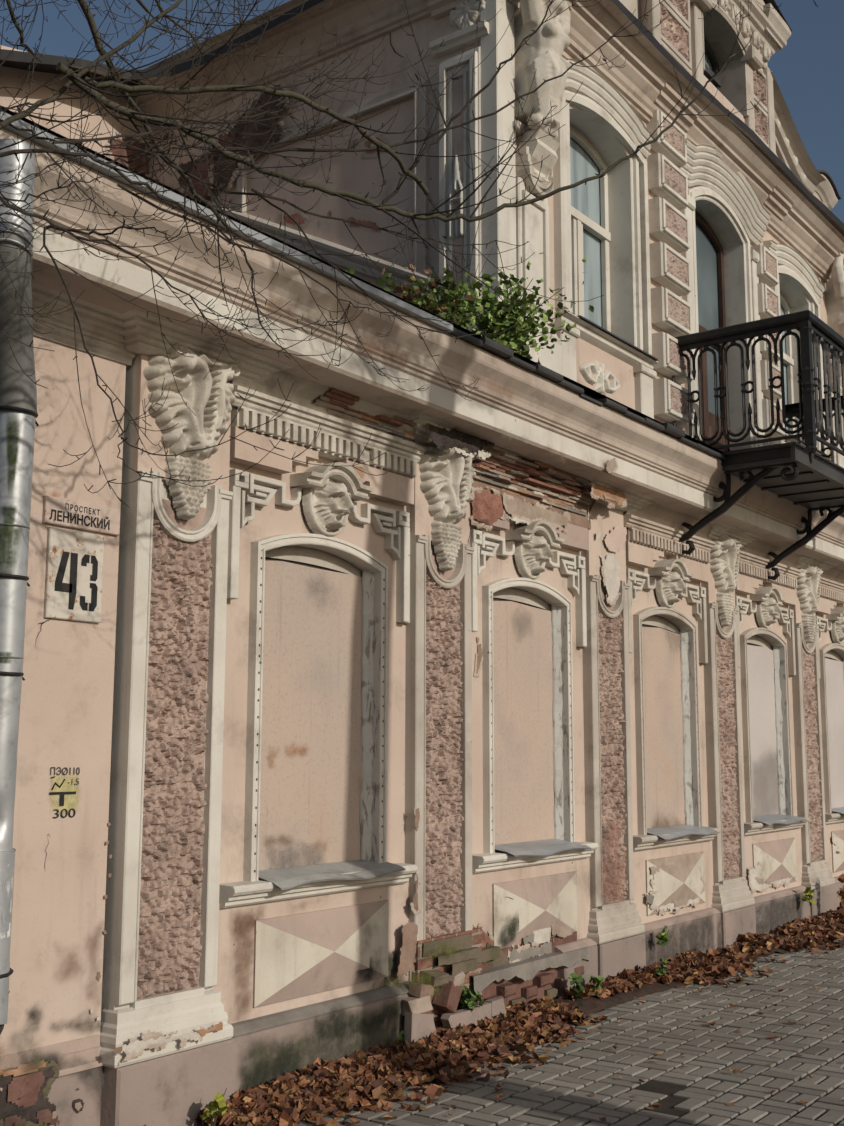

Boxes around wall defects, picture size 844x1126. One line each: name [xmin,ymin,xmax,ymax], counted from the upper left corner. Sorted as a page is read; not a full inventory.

spalling [105,131,150,175]
spalling [175,82,289,201]
spalling [312,388,627,533]
peeling [596,525,627,605]
spalling [470,923,590,1005]
spalling [0,1060,60,1126]
spalling [72,1088,85,1113]